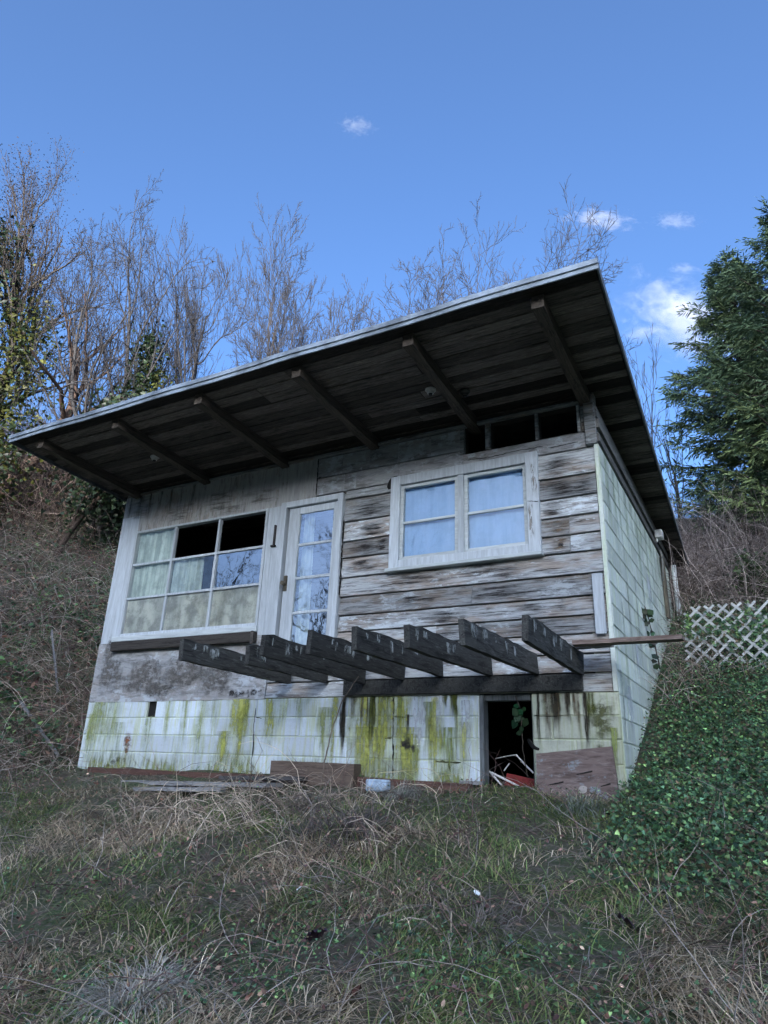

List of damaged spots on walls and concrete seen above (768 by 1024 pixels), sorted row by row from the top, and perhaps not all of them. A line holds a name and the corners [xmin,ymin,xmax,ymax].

damp [545,459,589,515]
damp [354,503,387,570]
damp [399,570,454,623]
damp [471,563,517,599]
damp [217,689,284,762]
damp [320,695,466,783]